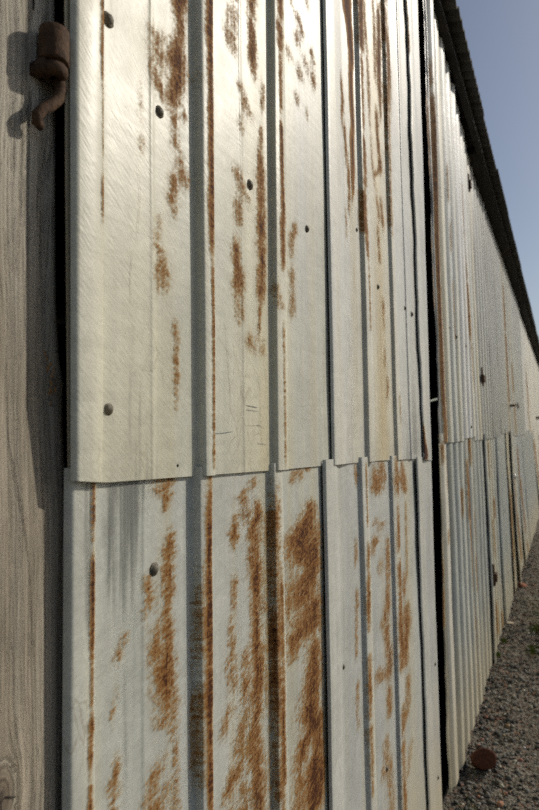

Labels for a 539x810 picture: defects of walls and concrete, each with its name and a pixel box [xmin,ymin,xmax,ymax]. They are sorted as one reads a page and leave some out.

corrosion [154,222,170,292]
corrosion [148,0,190,218]
corrosion [340,0,393,330]
corrosion [426,60,449,464]
corrosion [108,757,121,810]
corrosion [142,527,182,810]
corrosion [153,478,176,512]
corrosion [190,0,329,810]
corrosion [354,457,413,810]